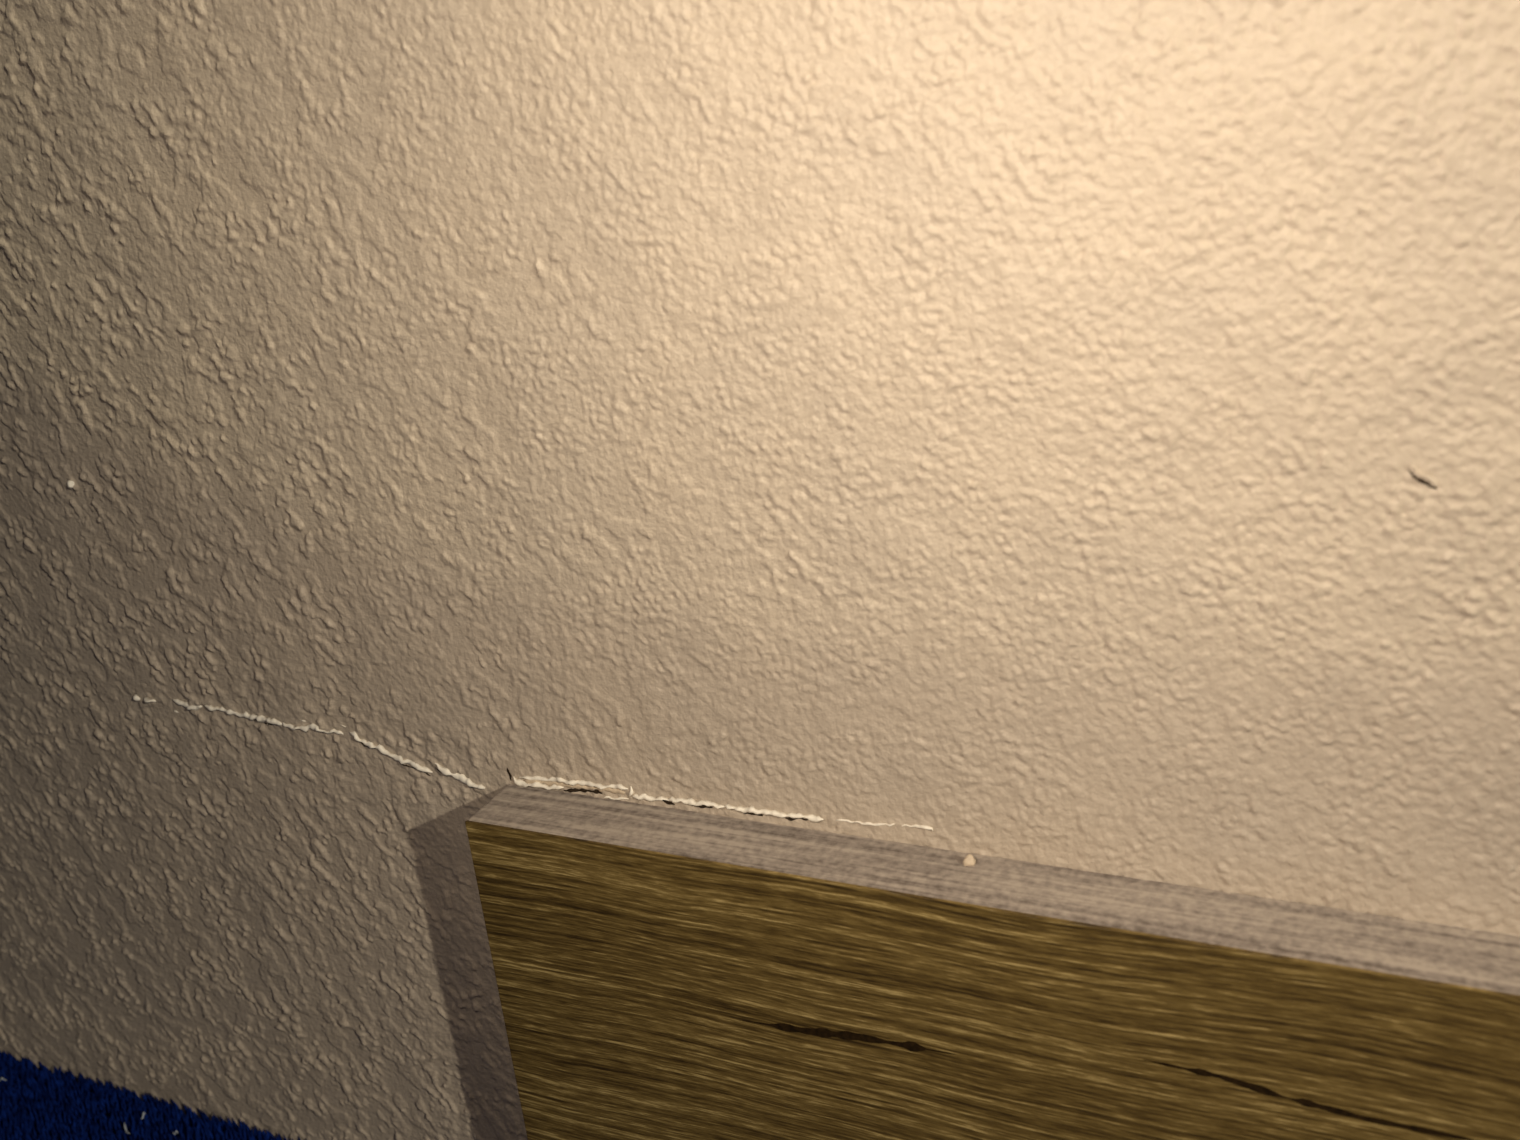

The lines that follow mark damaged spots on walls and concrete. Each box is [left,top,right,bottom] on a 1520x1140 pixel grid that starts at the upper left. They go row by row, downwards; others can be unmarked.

crack [133,694,485,789]